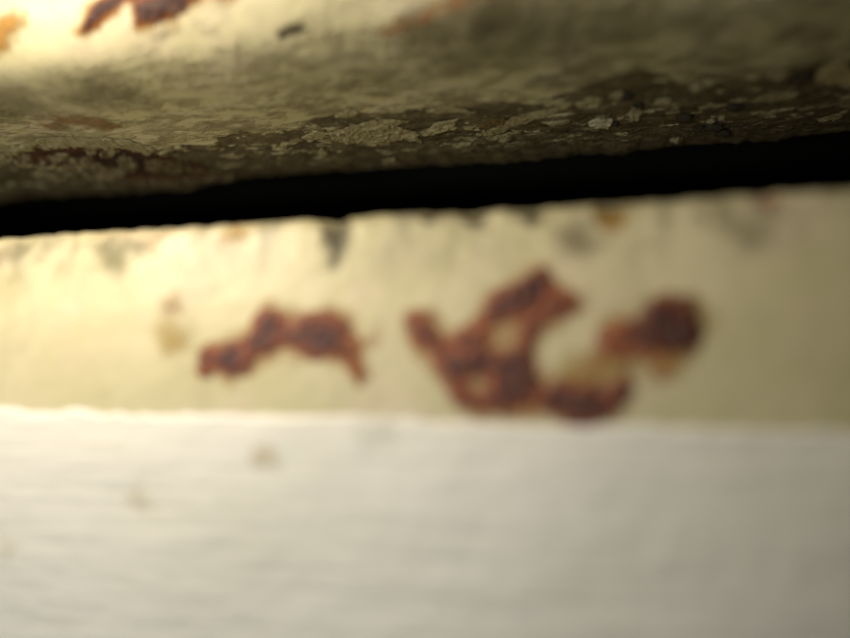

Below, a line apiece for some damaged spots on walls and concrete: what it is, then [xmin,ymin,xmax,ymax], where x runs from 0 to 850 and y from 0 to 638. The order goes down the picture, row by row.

corrosion [75,0,199,35]
peeling [0,136,284,184]
peeling [301,106,476,159]
peeling [453,89,644,149]
peeling [676,62,850,138]
corrosion [198,308,368,384]
corrosion [405,264,705,428]